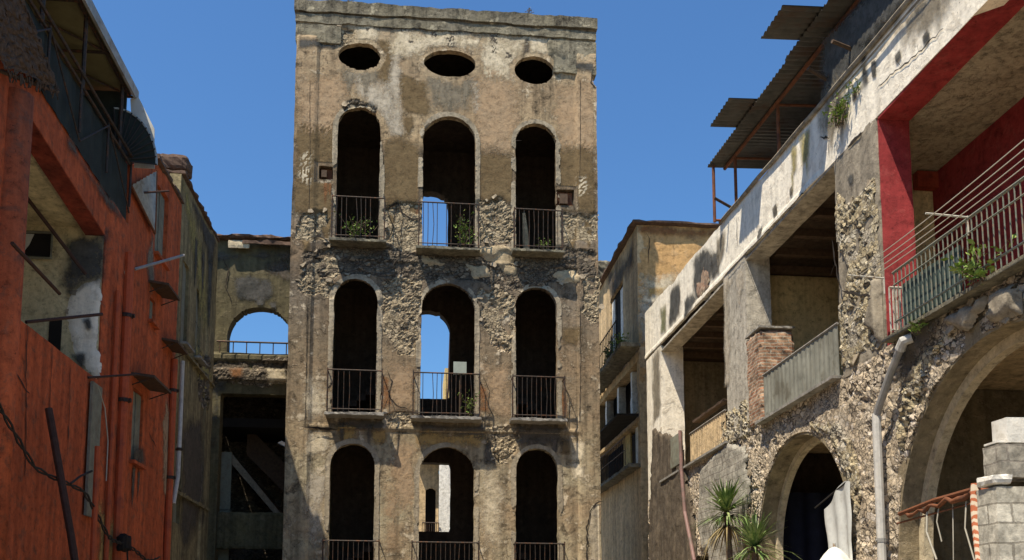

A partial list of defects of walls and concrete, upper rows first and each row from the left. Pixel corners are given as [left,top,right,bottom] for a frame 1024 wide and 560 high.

leakage [61,230,109,292]
spalling [295,194,604,428]
spalling [834,177,884,368]
flaking render [572,442,585,478]